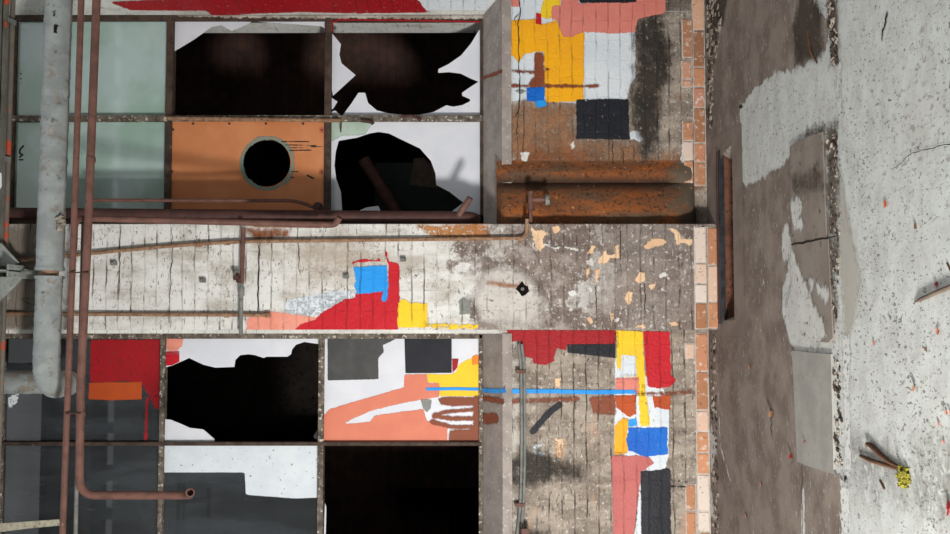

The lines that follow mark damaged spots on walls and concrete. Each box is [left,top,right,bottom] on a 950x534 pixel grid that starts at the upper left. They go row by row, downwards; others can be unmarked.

peeling [530,226,620,292]
peeling [625,272,668,305]
peeling [644,0,844,534]